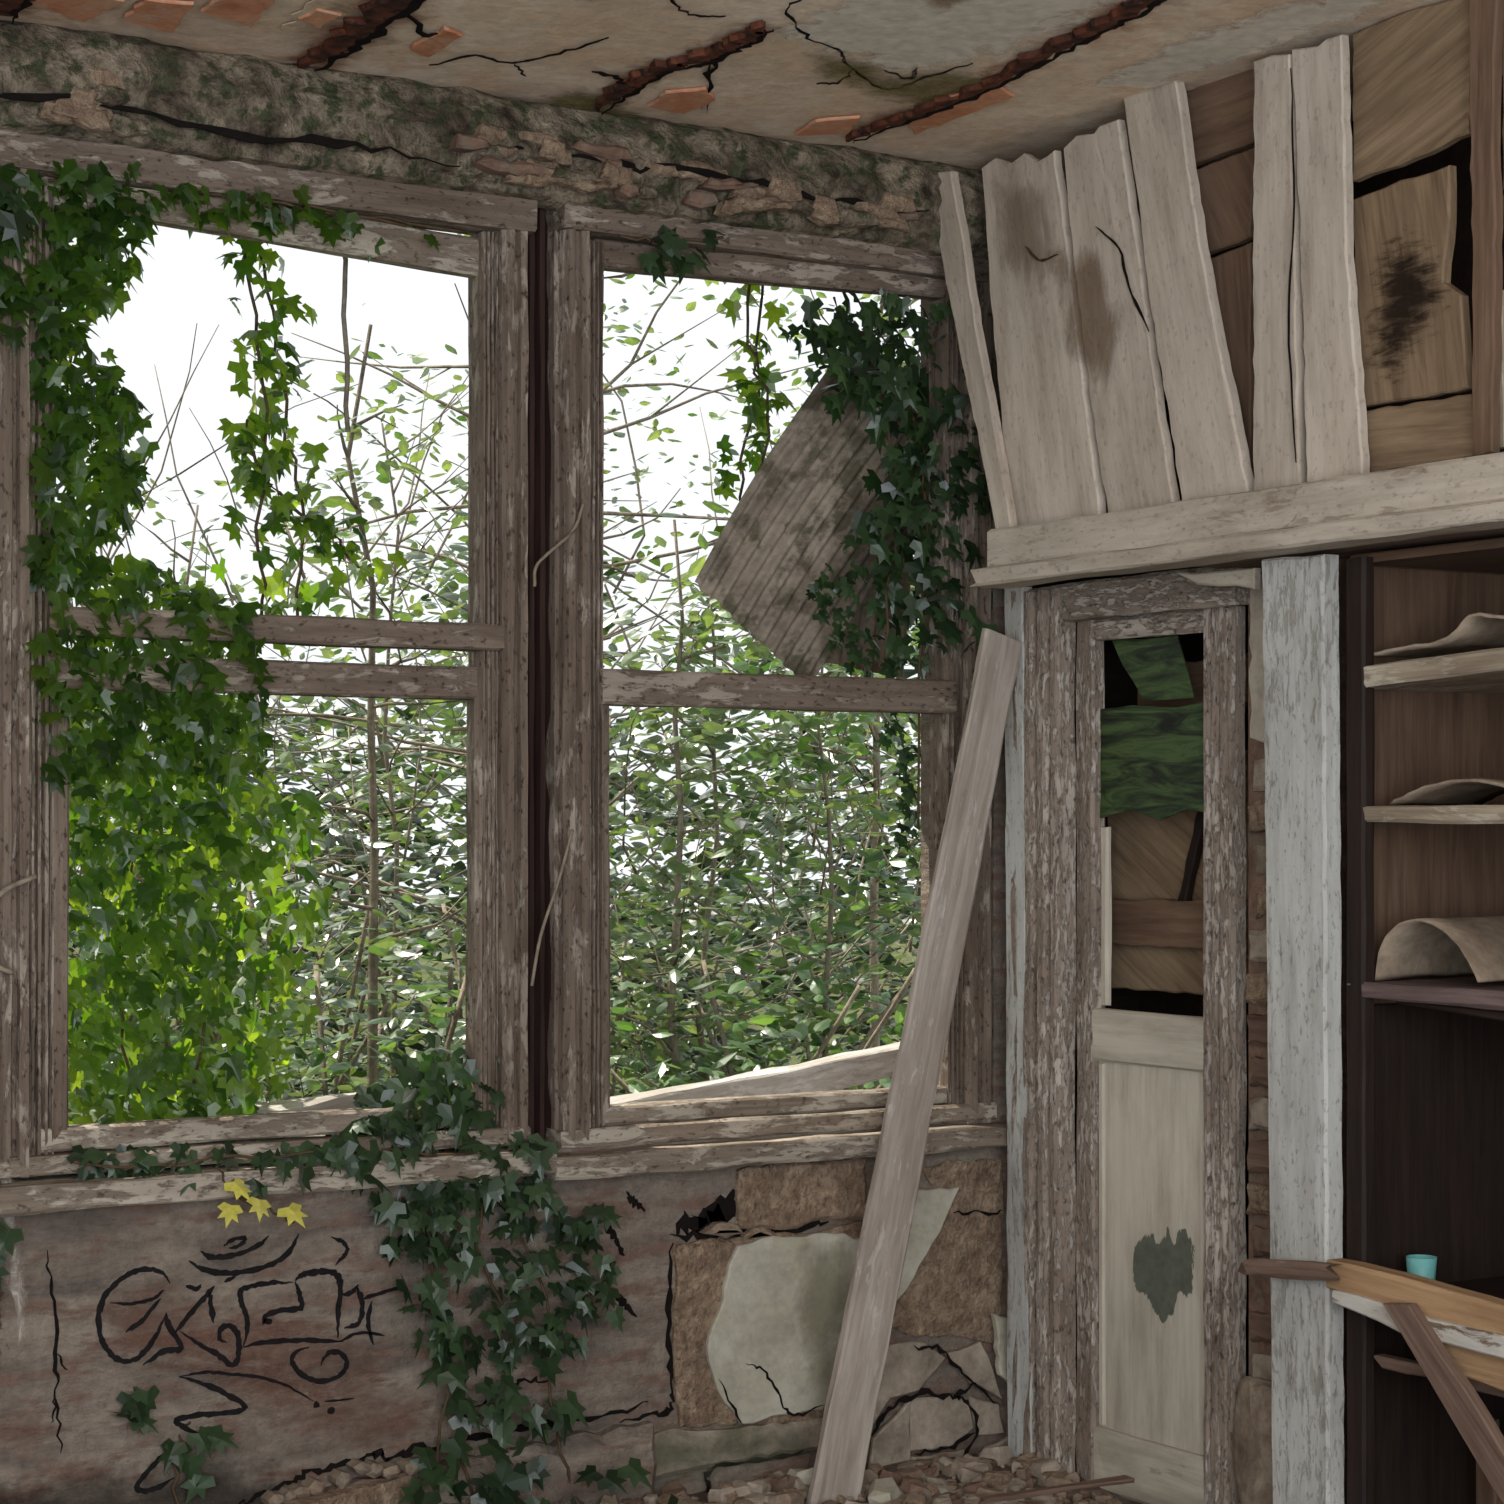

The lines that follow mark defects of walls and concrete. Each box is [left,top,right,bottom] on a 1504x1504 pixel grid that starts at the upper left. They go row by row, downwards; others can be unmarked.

spalling [19,0,275,33]
spalling [280,0,368,31]
crack [289,0,1167,143]
crack [0,93,460,167]
crack [571,153,930,213]
crack [954,1209,1003,1217]
crack [46,1250,68,1453]
crack [871,1344,1000,1456]
crack [704,1448,814,1493]